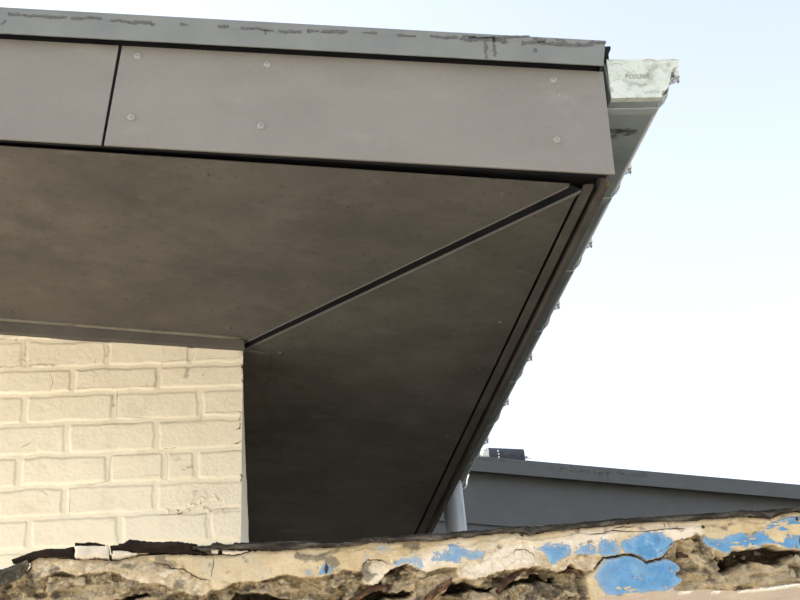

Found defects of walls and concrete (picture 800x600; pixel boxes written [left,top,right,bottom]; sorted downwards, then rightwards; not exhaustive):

spalling [0,516,800,600]
crack [591,524,697,566]